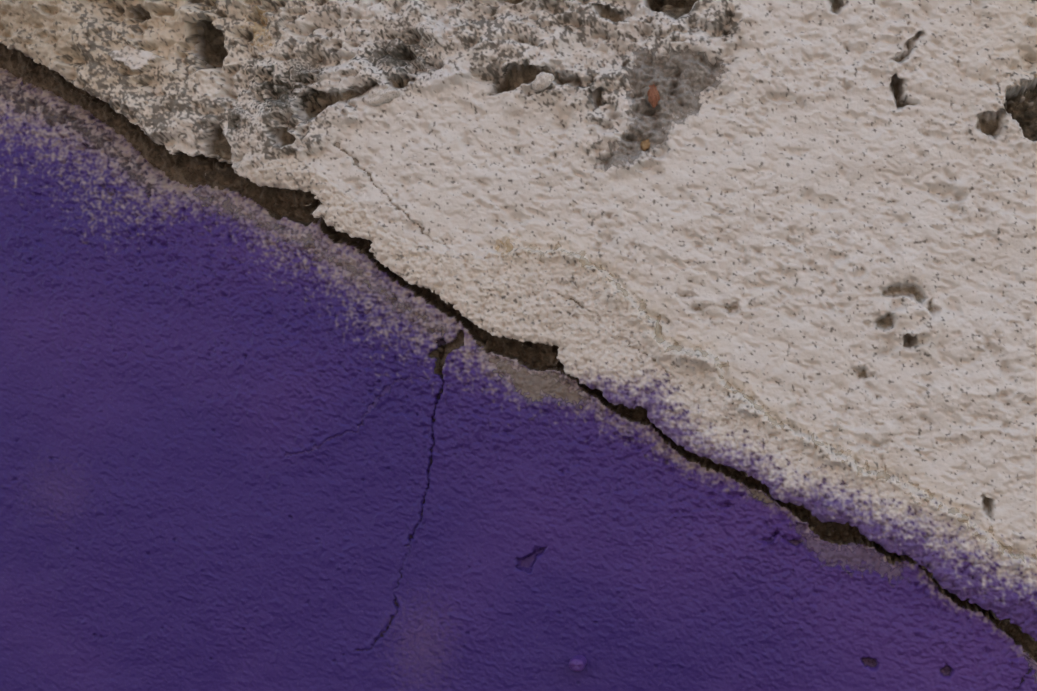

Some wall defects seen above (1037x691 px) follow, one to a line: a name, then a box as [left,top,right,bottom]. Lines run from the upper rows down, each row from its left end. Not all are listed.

peeling [0,80,153,198]
peeling [108,44,160,72]
spalling [594,47,725,170]
spalling [1003,78,1037,142]
crack [334,142,446,245]
crack [428,330,464,379]